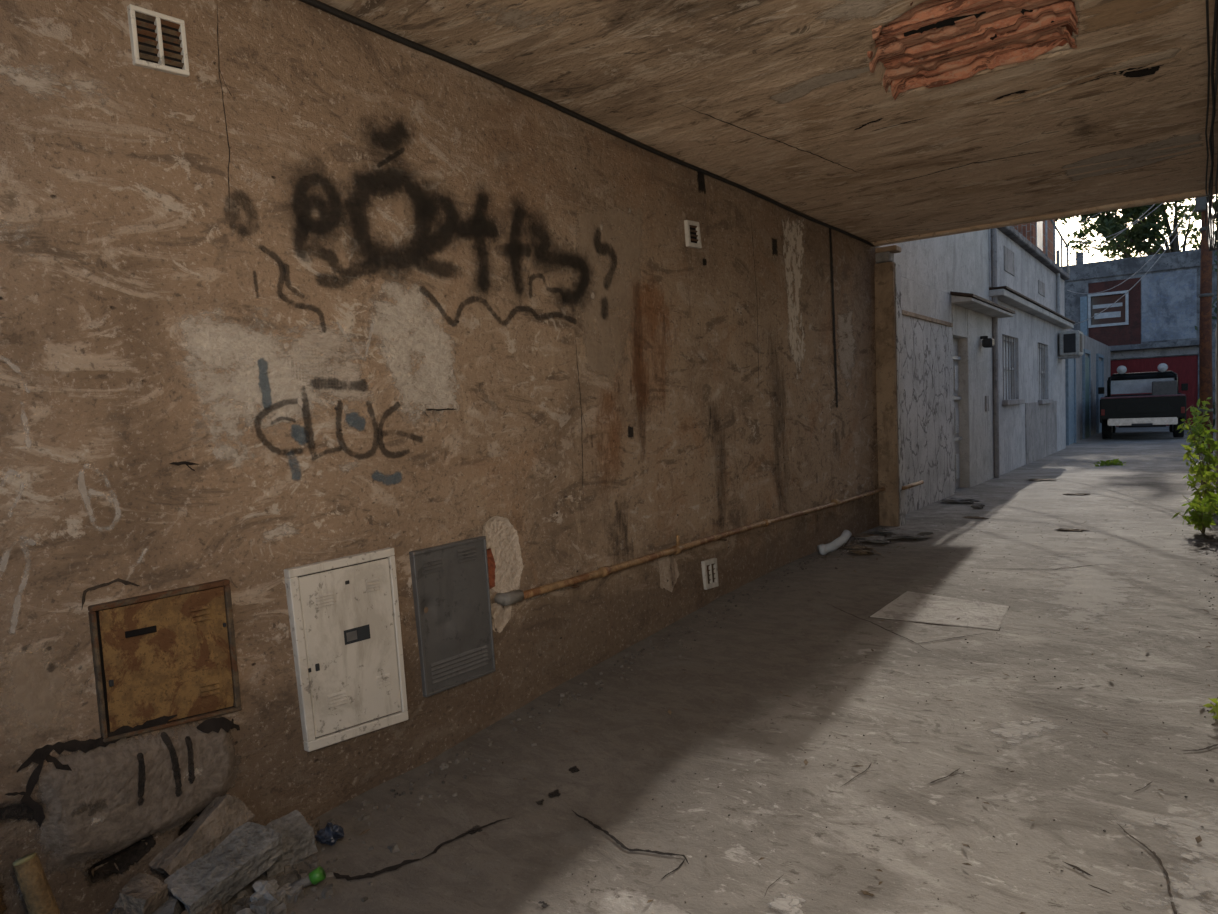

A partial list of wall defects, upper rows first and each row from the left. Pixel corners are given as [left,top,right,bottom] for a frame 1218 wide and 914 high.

spalling [865,0,1081,100]
crack [995,47,1181,103]
spalling [482,516,586,633]
crack [333,818,510,881]
crack [572,810,689,879]